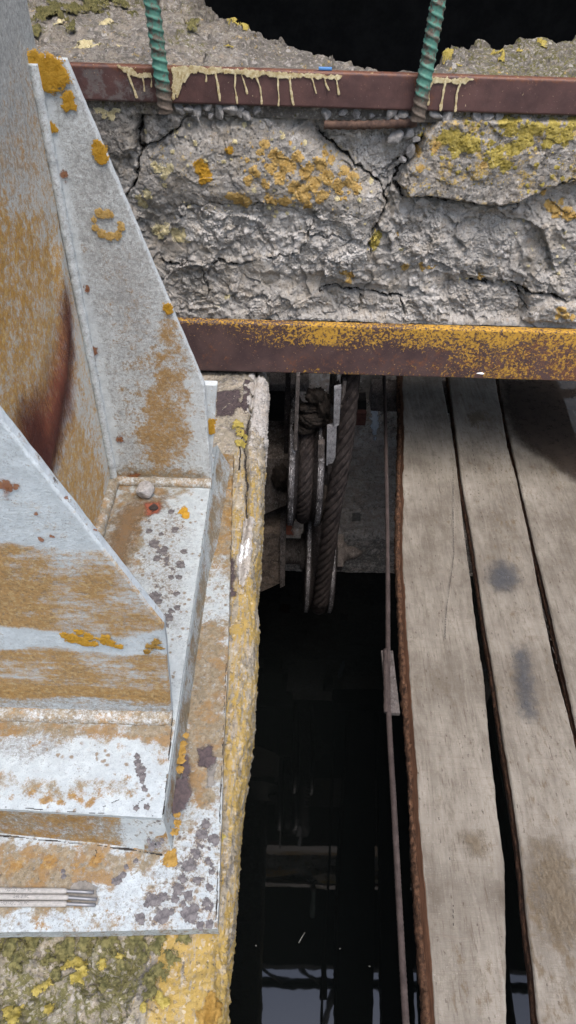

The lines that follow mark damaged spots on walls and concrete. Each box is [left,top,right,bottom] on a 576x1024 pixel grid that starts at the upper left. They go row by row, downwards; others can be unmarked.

spalling [27,0,152,64]
spalling [159,0,377,71]
spalling [433,35,576,78]
spalling [86,100,159,114]
crack [127,115,185,194]
crack [318,130,423,242]
crack [319,283,403,304]
crack [469,277,565,314]
rust [18,290,75,469]